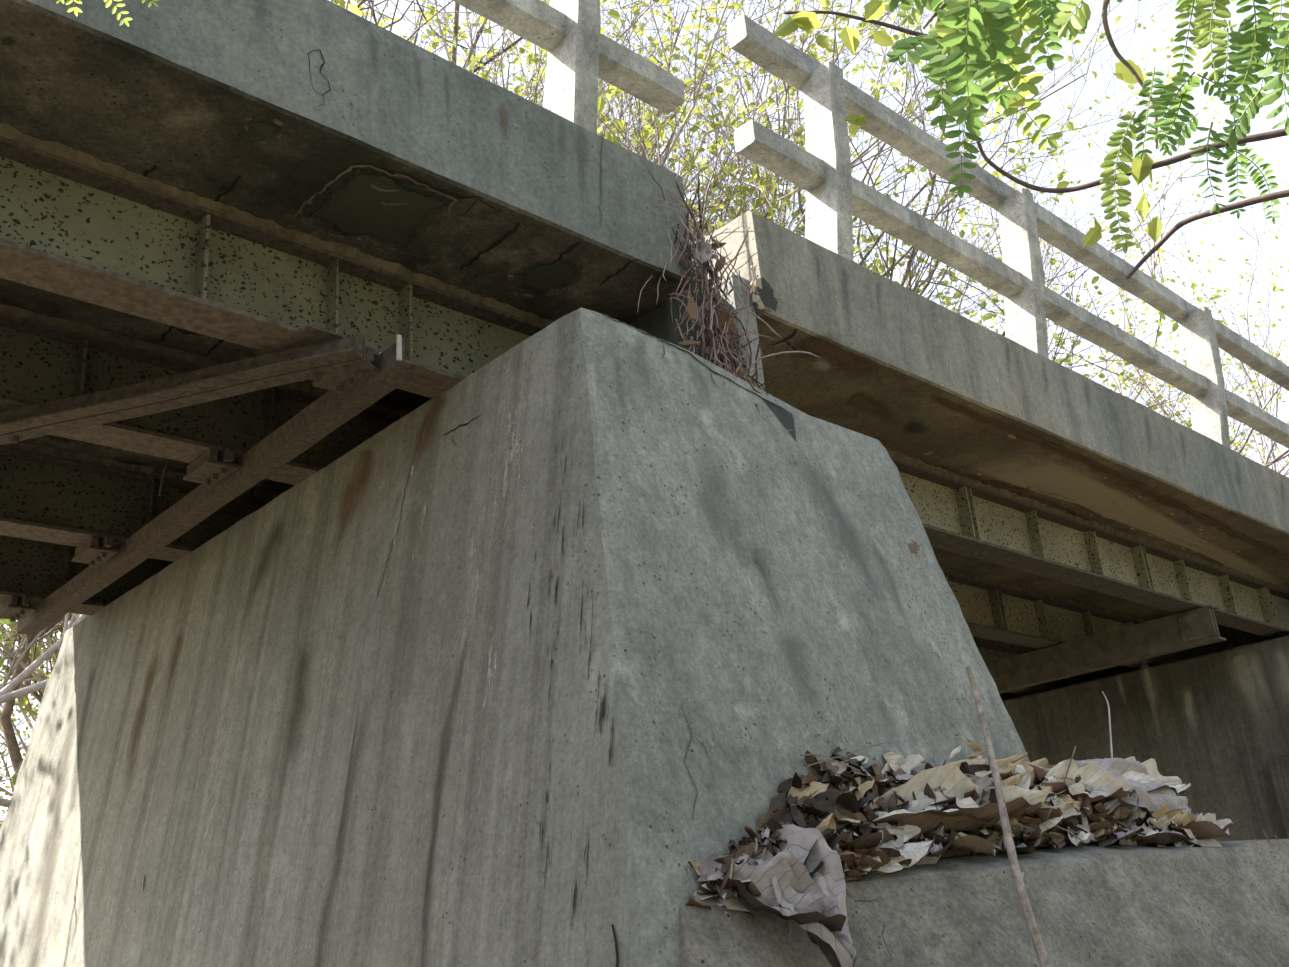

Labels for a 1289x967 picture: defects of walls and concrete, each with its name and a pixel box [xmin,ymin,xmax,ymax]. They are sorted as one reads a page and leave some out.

crack [307,49,331,106]
leakage [422,665,461,967]
leakage [571,839,589,927]